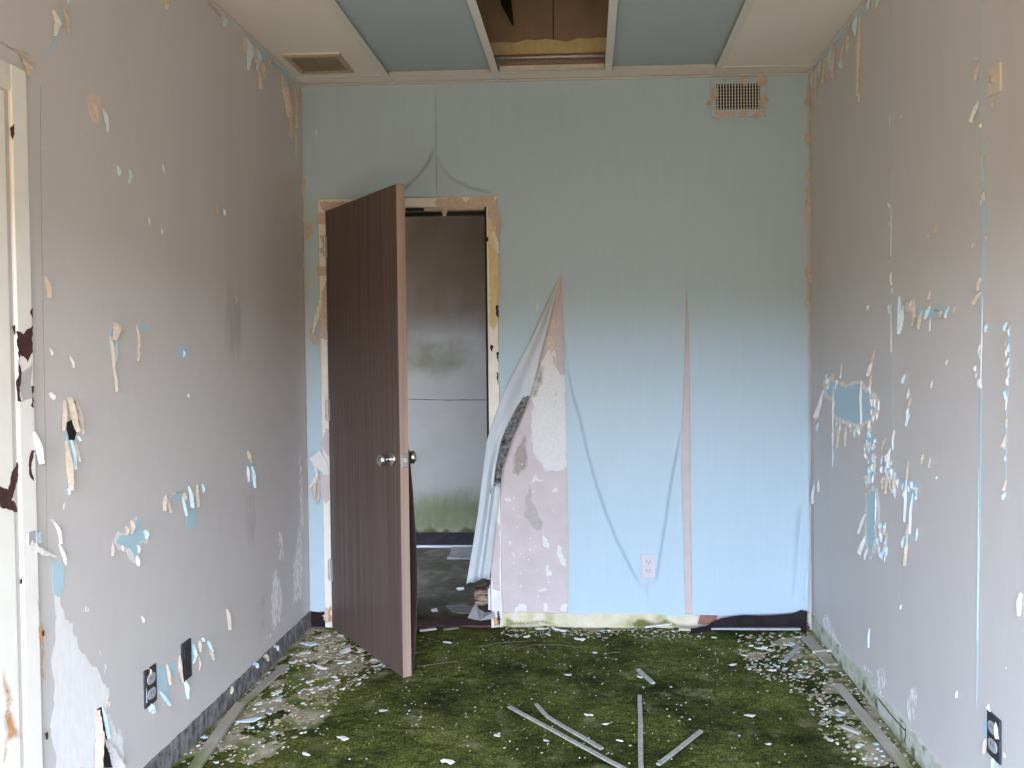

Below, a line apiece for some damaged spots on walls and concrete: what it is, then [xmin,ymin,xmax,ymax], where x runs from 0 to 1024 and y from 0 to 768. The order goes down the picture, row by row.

peeling [207,0,302,118]
peeling [706,75,769,119]
peeling [803,0,890,146]
spalling [12,308,34,408]
peeling [811,148,957,566]
spalling [0,432,45,512]
peeling [47,392,85,495]
flaking render [505,349,568,612]
peeling [111,517,149,566]
peeling [94,700,126,768]